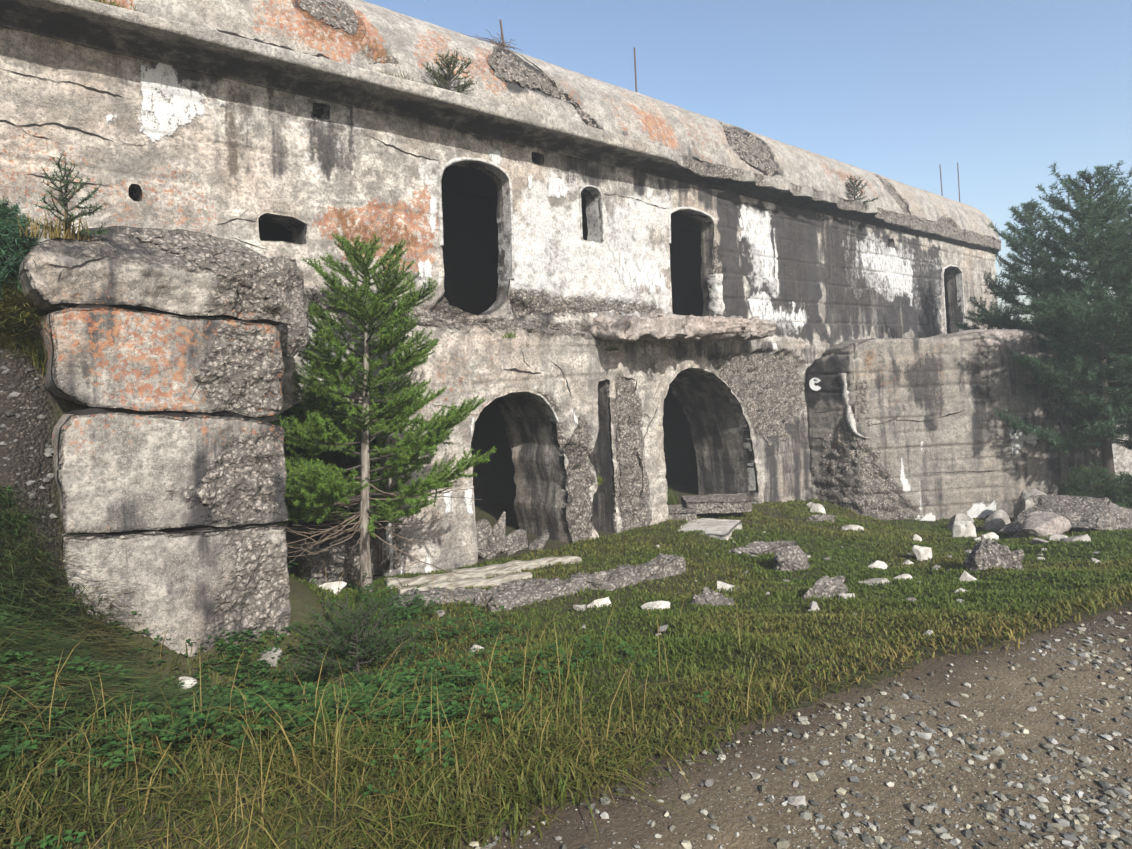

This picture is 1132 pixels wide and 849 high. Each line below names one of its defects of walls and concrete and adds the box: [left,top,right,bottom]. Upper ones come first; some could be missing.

crack [216,28,329,58]
spalling [300,0,359,35]
rust [297,5,398,66]
crack [0,68,131,100]
peeling [138,63,228,143]
leakage [225,88,251,174]
leakage [309,105,355,181]
rust [329,202,420,261]
leakage [773,212,809,328]
leakage [821,214,875,322]
spalling [711,350,806,446]
spalling [812,380,923,520]